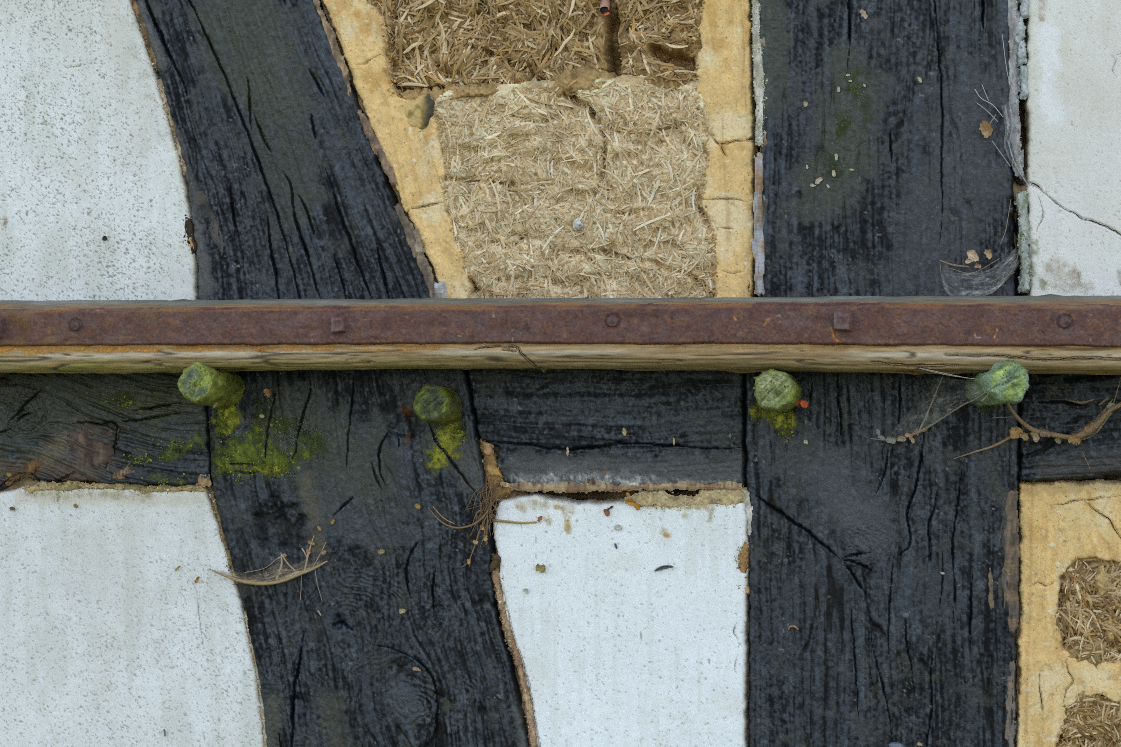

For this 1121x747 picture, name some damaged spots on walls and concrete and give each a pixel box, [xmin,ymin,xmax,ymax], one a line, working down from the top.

spalling [367,0,718,298]
crack [1023,182,1121,236]
spalling [1055,558,1121,668]
spalling [1056,691,1121,747]